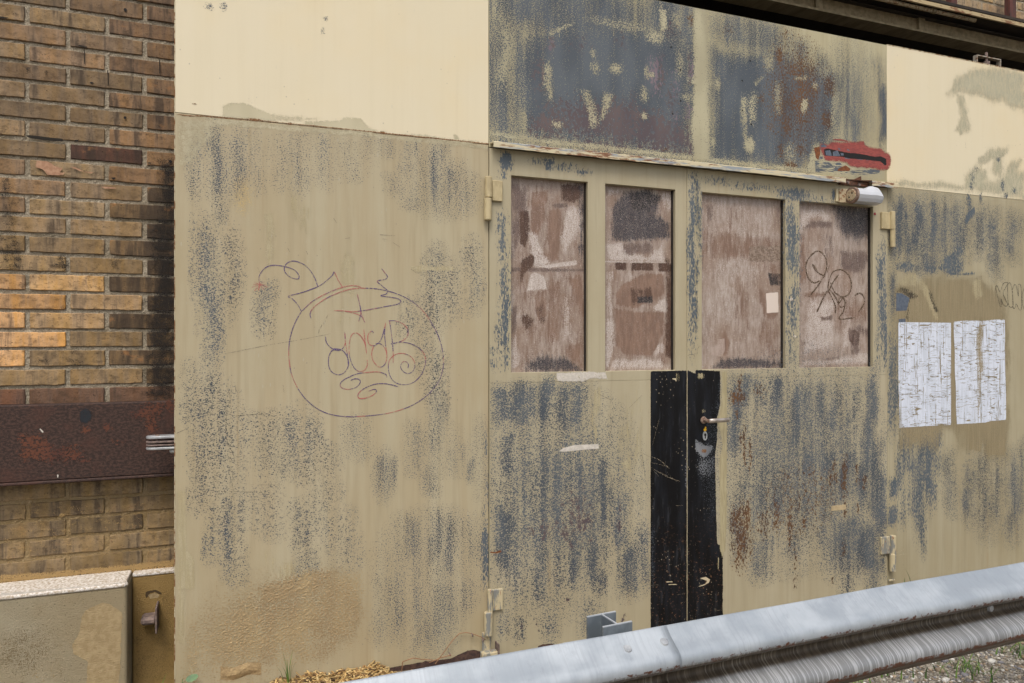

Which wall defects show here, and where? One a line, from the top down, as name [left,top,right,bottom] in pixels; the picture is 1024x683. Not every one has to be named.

damp [160,166,174,201]
damp [150,293,174,347]
peeling [489,0,1024,595]
peeling [178,117,676,661]
corrosion [728,374,767,474]
corrosion [729,453,867,588]